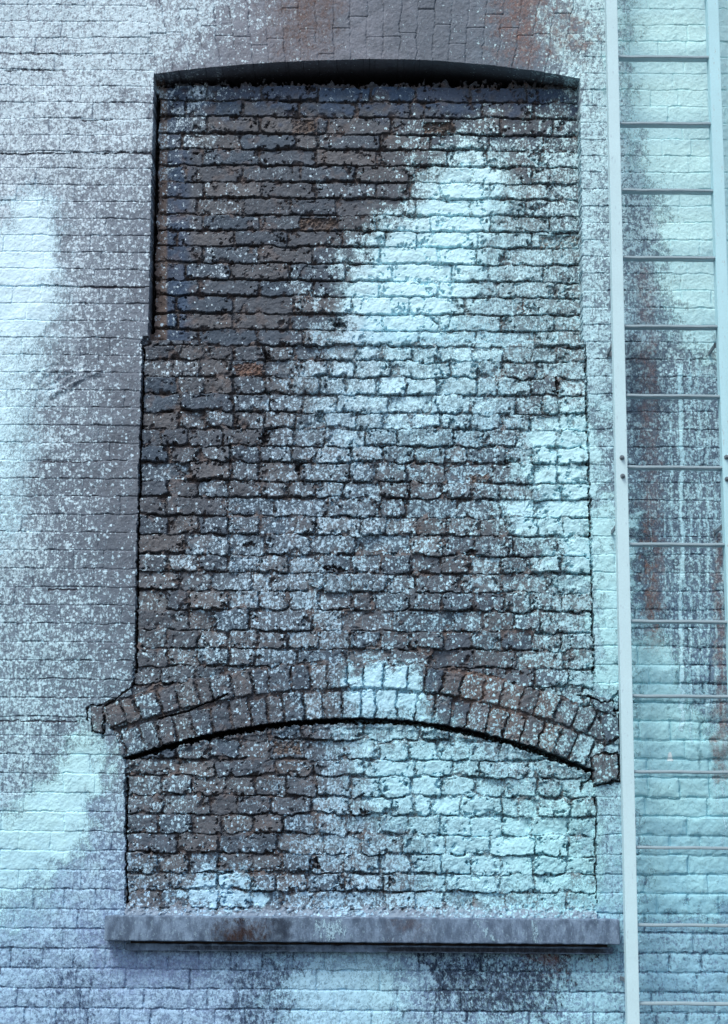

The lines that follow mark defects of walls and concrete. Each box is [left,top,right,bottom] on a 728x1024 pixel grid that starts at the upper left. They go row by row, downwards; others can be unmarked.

damp [0,180,85,564]
damp [0,714,127,955]
crack [0,86,161,739]
crack [122,344,620,904]
damp [274,124,619,716]
damp [323,647,623,943]
damp [617,0,728,944]